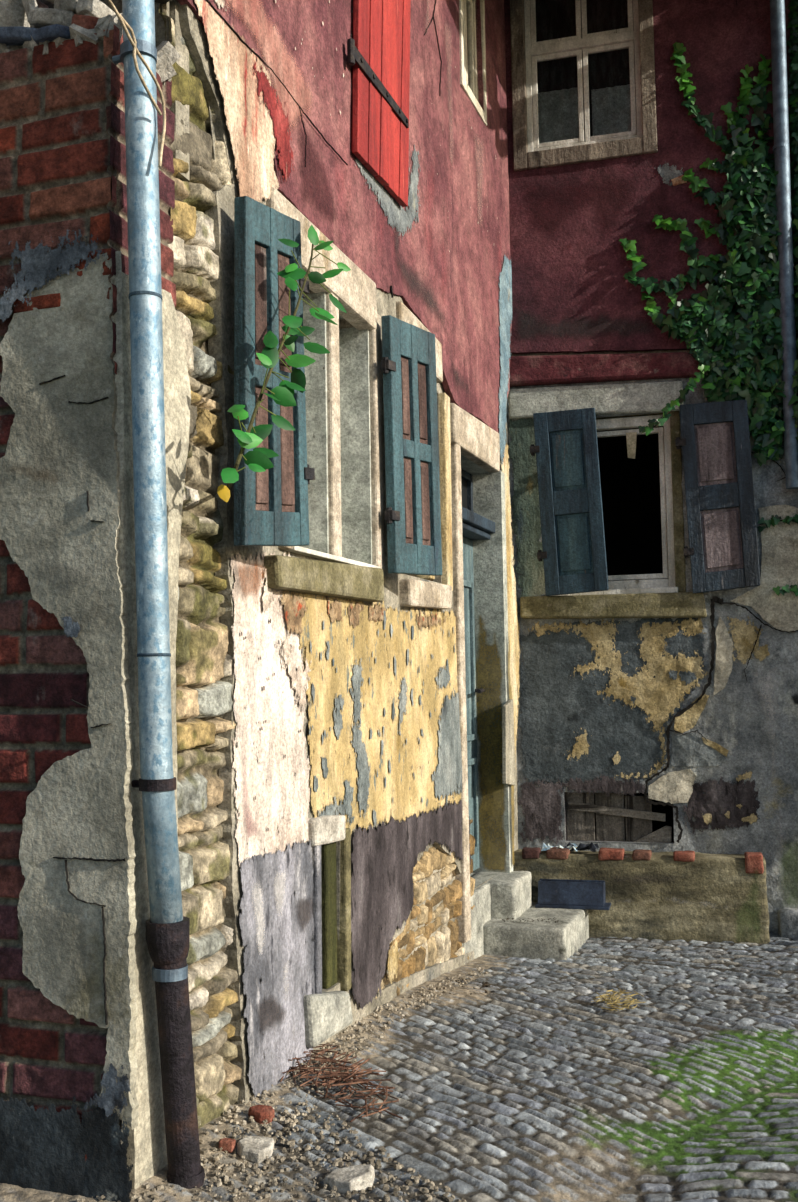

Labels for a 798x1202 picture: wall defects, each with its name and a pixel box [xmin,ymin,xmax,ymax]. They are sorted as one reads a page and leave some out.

peeling [195,0,294,202]
flaking render [0,227,109,322]
flaking render [0,355,15,458]
peeling [498,255,708,843]
flaking render [0,540,134,1131]
peeling [262,566,462,827]
crack [644,596,798,843]
peeling [683,771,760,836]
crack [53,857,125,1025]